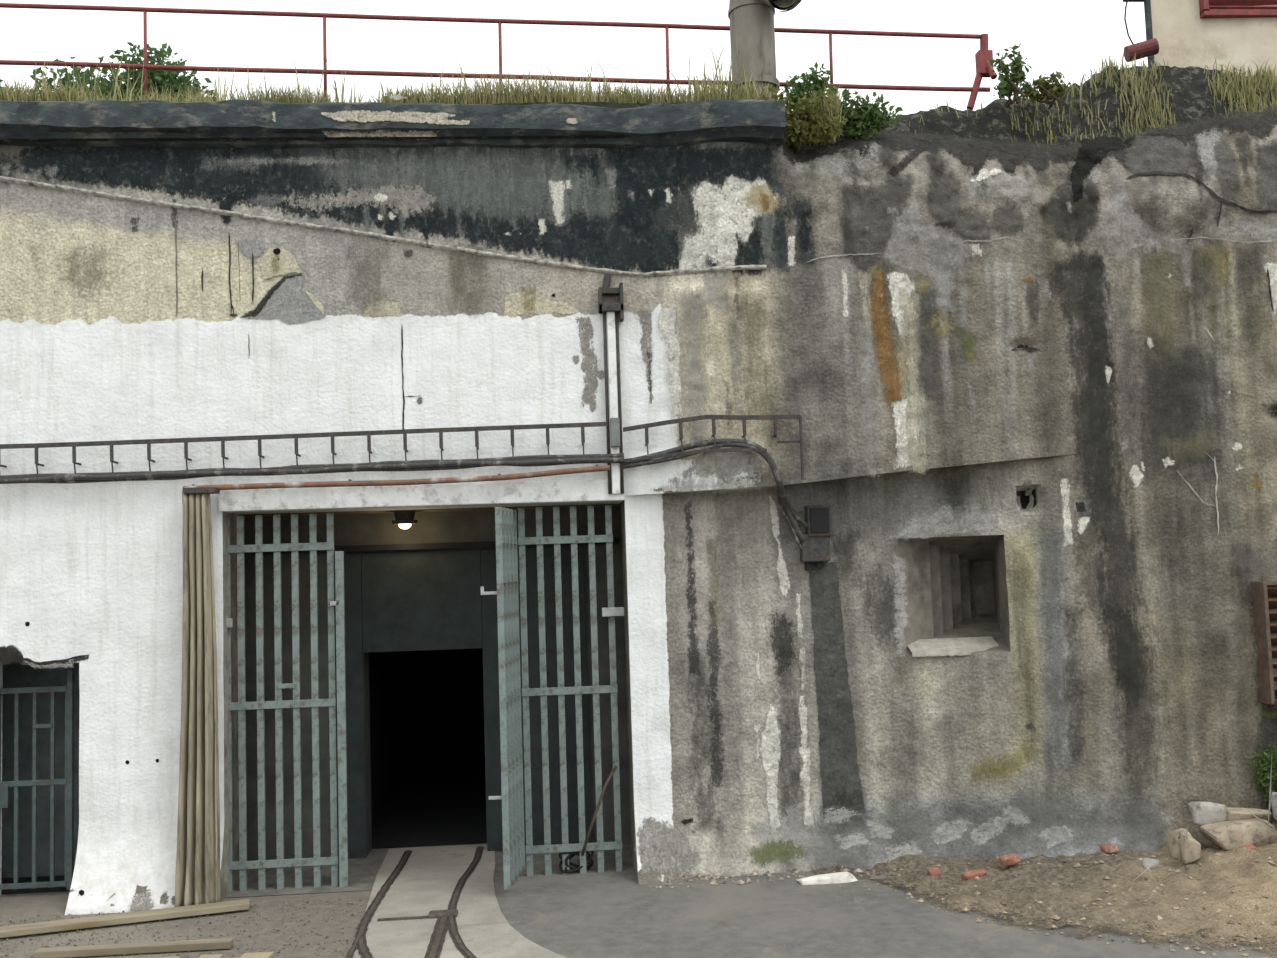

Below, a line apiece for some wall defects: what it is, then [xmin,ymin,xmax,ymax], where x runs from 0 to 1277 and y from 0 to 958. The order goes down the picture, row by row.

peeling [235,240,325,324]
peeling [504,292,604,412]
damp [0,104,1277,275]
crack [808,253,878,262]
corrosion [868,272,907,410]
damp [887,271,941,473]
crack [946,236,1024,247]
crack [1102,171,1277,313]
damp [1052,251,1148,708]
spalling [0,645,89,668]
damp [684,503,725,786]
damp [754,495,865,833]